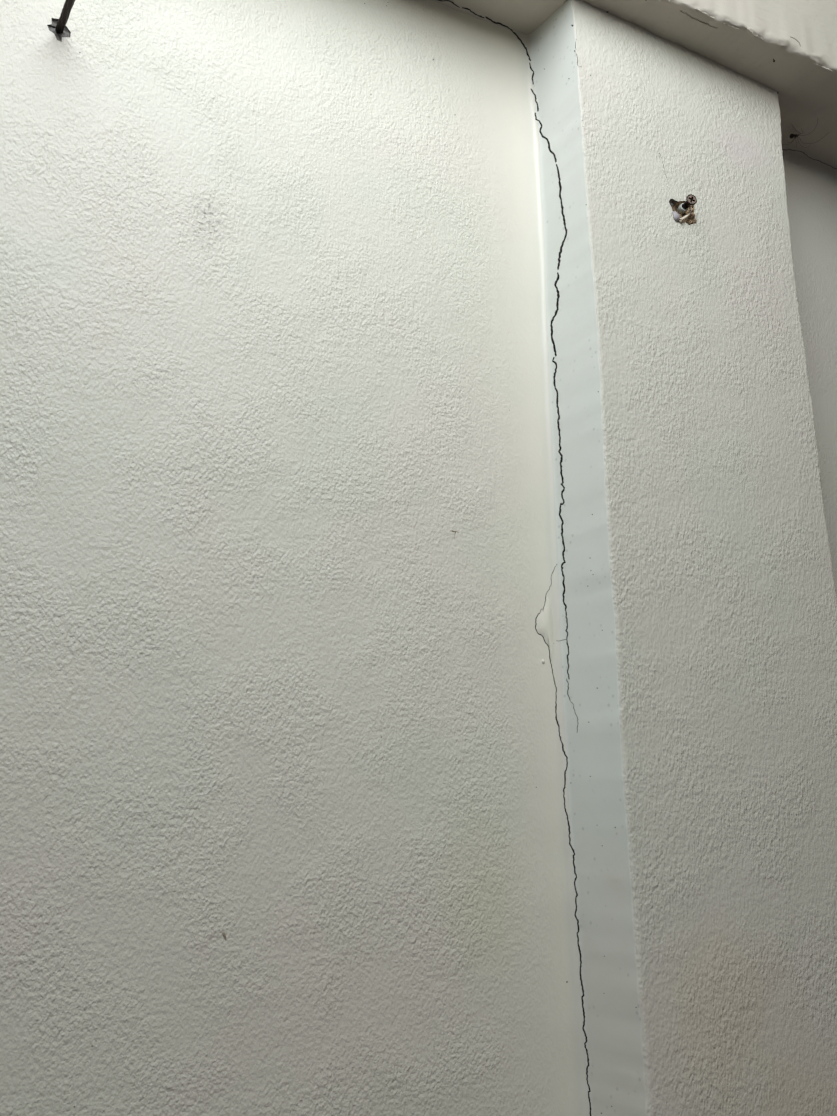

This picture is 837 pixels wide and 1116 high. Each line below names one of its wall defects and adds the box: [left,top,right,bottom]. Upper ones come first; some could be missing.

crack [438,0,591,1116]